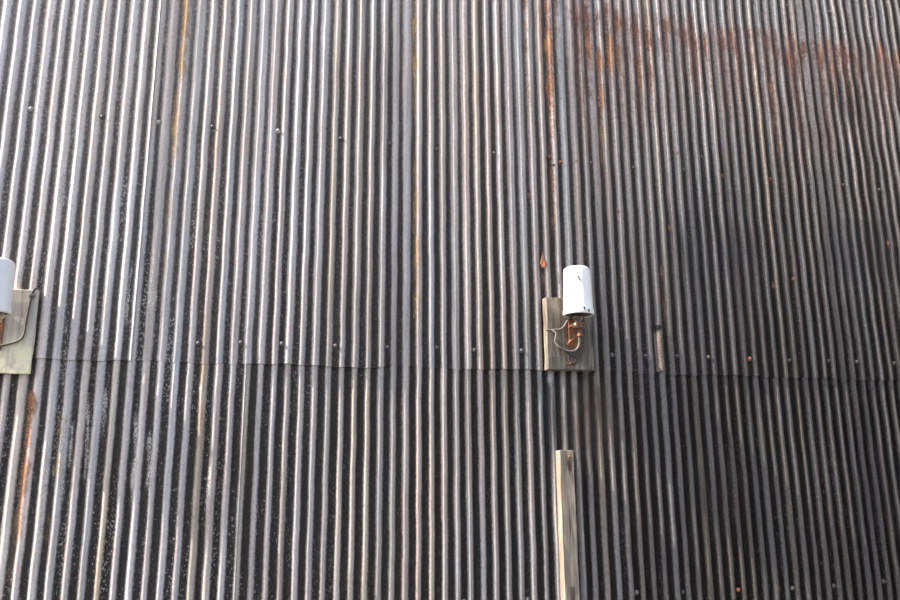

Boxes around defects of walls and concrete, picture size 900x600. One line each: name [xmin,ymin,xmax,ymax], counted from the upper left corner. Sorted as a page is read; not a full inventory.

rust [541,0,557,115]
rust [570,0,664,113]
rust [664,14,706,83]
rust [718,29,897,99]
rust [15,391,38,541]